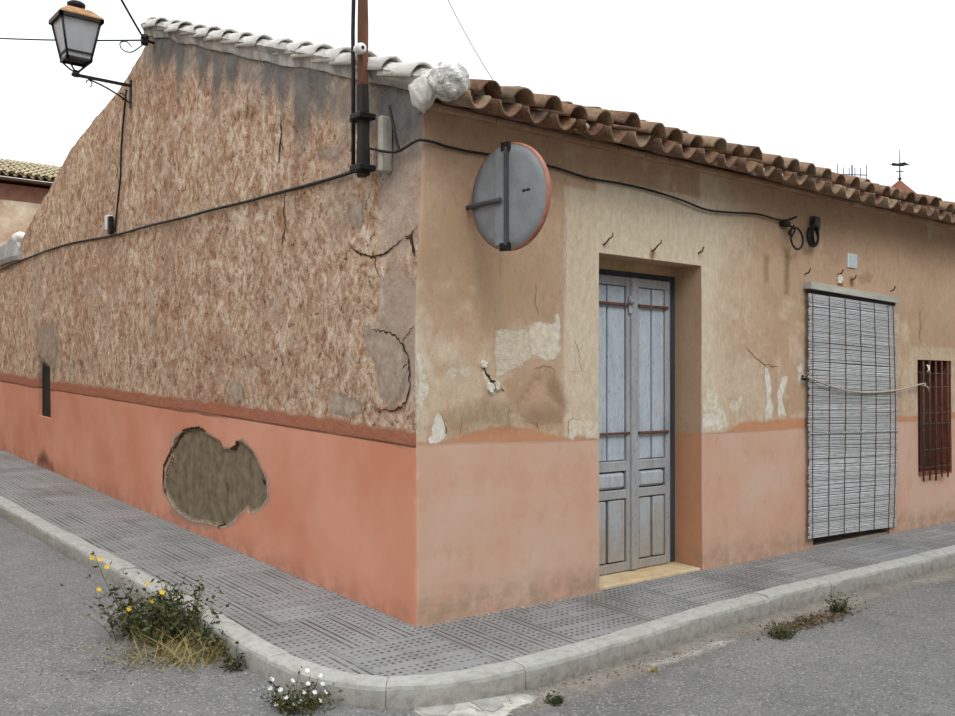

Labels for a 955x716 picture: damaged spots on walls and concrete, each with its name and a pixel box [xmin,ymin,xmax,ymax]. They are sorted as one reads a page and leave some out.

crack [372,326,414,412]
peeling [445,314,563,396]
peeling [702,387,743,433]
peeling [764,363,804,422]
spalling [162,426,270,529]